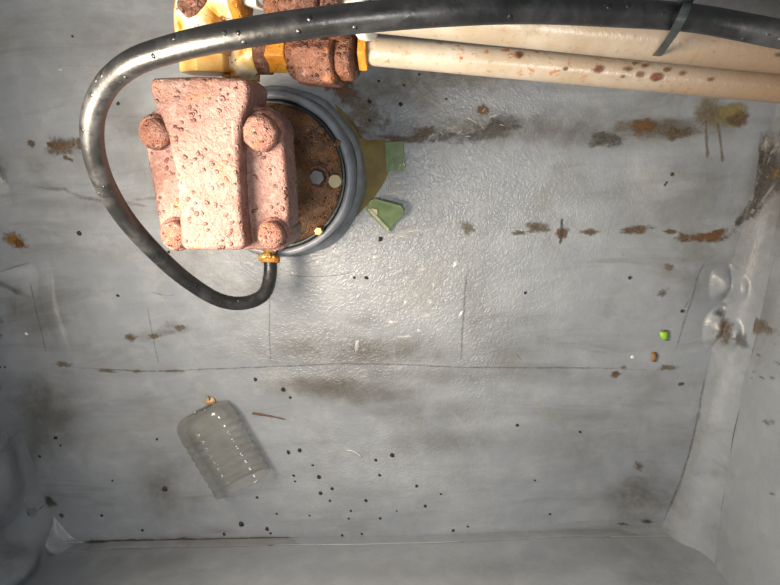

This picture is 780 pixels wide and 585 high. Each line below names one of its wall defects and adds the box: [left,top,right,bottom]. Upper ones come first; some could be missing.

corrosion [591,119,688,147]
corrosion [47,138,81,161]
corrosion [735,137,780,225]
corrosion [5,233,25,247]
corrosion [513,219,568,243]
corrosion [622,226,646,234]
corrosion [663,229,725,242]